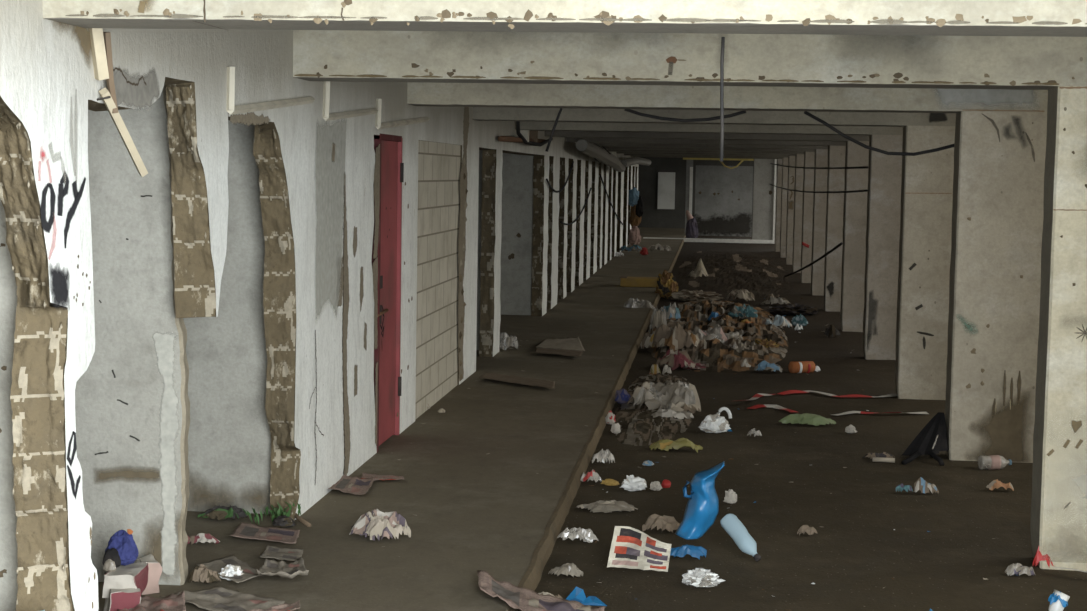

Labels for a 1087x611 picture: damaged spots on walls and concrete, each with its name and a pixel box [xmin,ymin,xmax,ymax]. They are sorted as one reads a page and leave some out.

spalling [436,9,472,22]
spalling [486,9,557,29]
spalling [594,11,643,26]
spalling [925,14,964,27]
spalling [1012,16,1033,24]
spalling [103,70,216,317]
spalling [230,112,301,520]
spalling [0,99,73,611]
leakage [977,371,1028,462]
leakage [1047,421,1083,457]